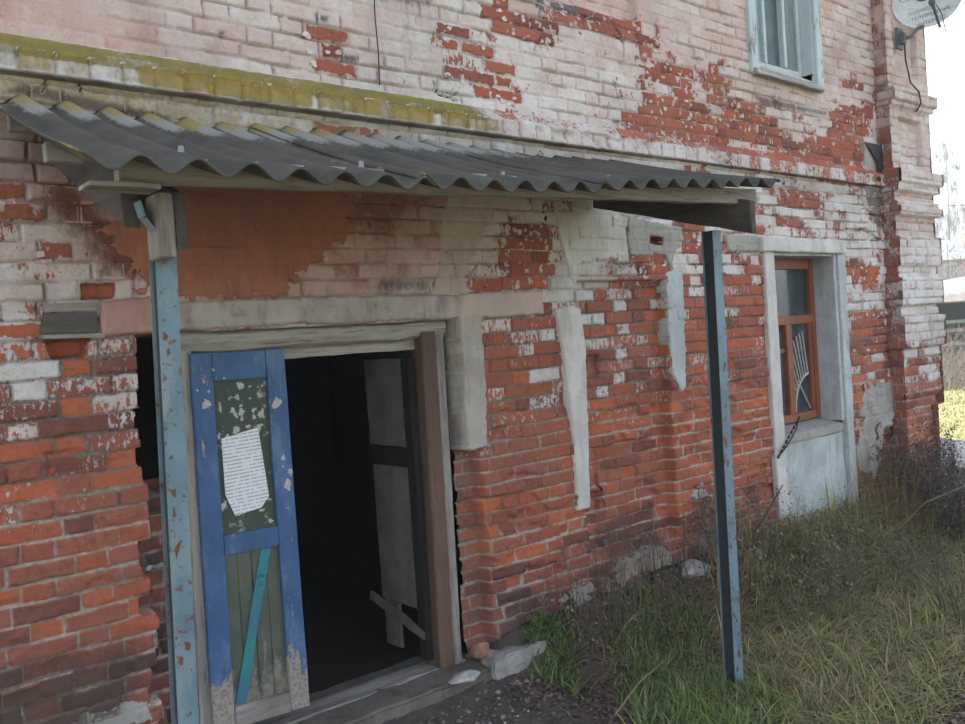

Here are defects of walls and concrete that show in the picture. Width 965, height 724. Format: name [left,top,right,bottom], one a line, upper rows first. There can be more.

damp [13,86,168,121]
damp [139,67,498,131]
peeling [436,0,877,168]
peeling [483,223,557,291]
peeling [617,237,679,294]
peeling [674,221,706,254]
spalling [80,283,115,300]
spalling [0,323,91,359]
spalling [586,356,601,379]
spalling [586,433,660,512]
spalling [455,490,550,533]